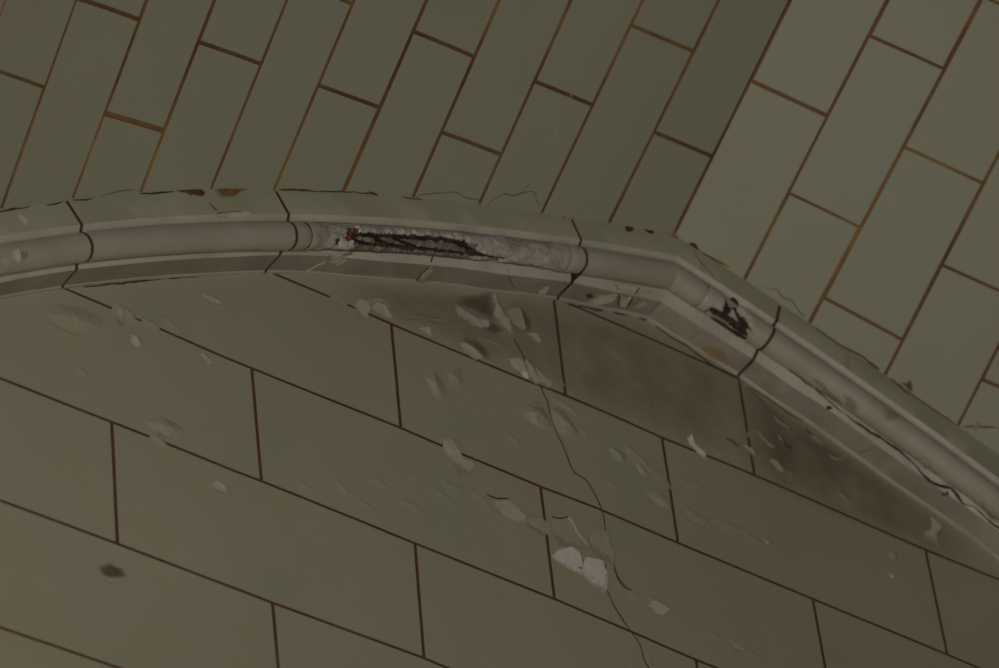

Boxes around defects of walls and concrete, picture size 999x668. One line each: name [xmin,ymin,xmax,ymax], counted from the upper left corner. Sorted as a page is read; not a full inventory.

spalling [302,221,572,272]
peeling [330,291,395,320]
peeling [414,294,565,388]
spalling [568,285,652,321]
spalling [695,284,760,339]
crack [656,326,802,421]
peeling [442,437,474,475]
crack [539,384,606,530]
peeling [687,434,707,461]
crack [790,370,999,529]
spalling [552,515,670,616]
crack [605,563,654,668]